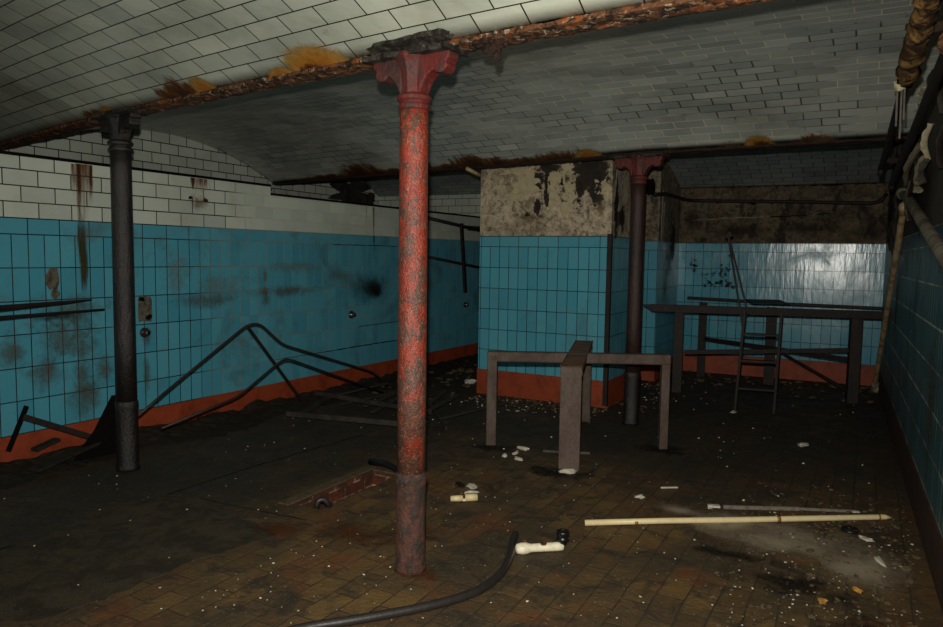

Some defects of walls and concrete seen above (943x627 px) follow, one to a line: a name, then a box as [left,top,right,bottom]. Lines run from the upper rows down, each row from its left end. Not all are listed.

spalling [366,28,455,56]
rust [269,46,349,77]
rust [156,78,216,100]
rust [71,164,93,214]
peeling [483,163,579,217]
peeling [594,179,612,194]
rust [78,226,88,286]
mould [690,255,734,289]